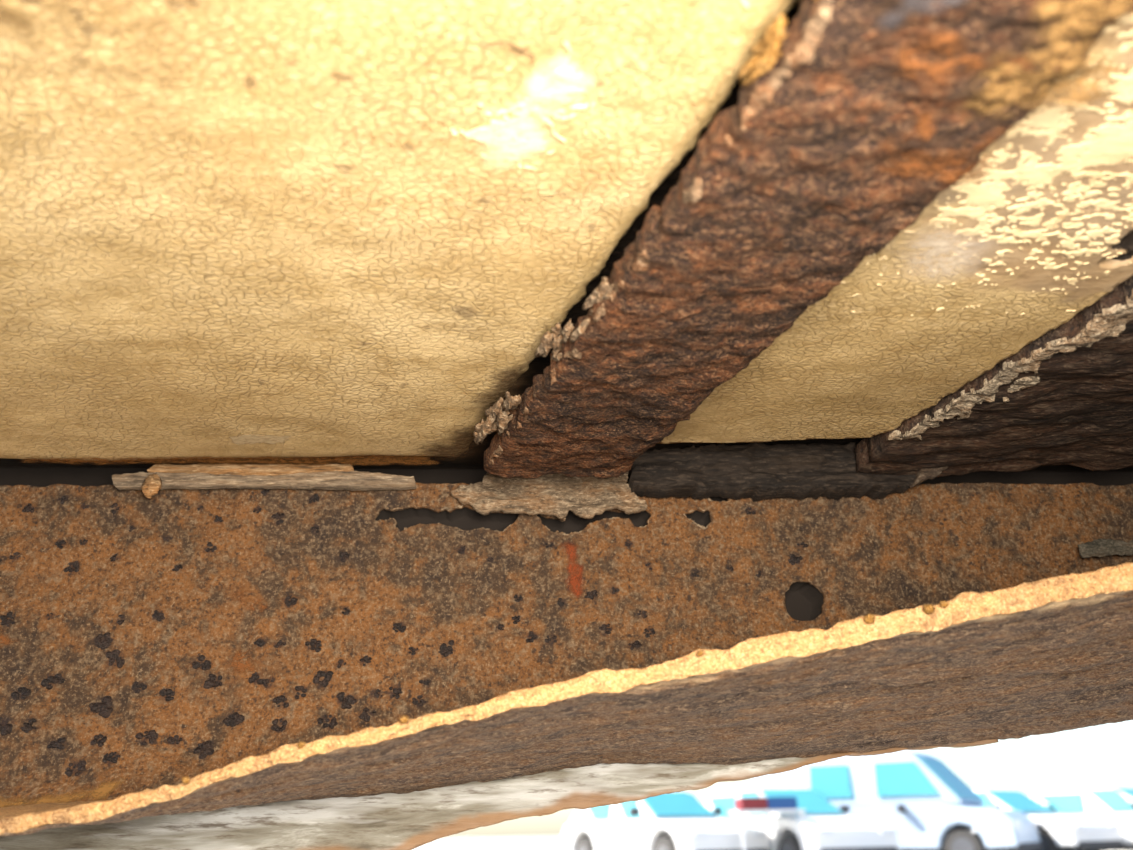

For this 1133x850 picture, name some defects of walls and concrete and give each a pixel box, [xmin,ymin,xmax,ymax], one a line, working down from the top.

corrosion [898,0,1133,114]
peeling [450,57,608,174]
corrosion [888,144,985,183]
peeling [901,14,1133,294]
spalling [376,505,519,532]
spalling [536,510,650,548]
spalling [683,496,731,529]
spalling [788,542,808,565]
spalling [526,631,557,643]
spalling [628,610,656,650]